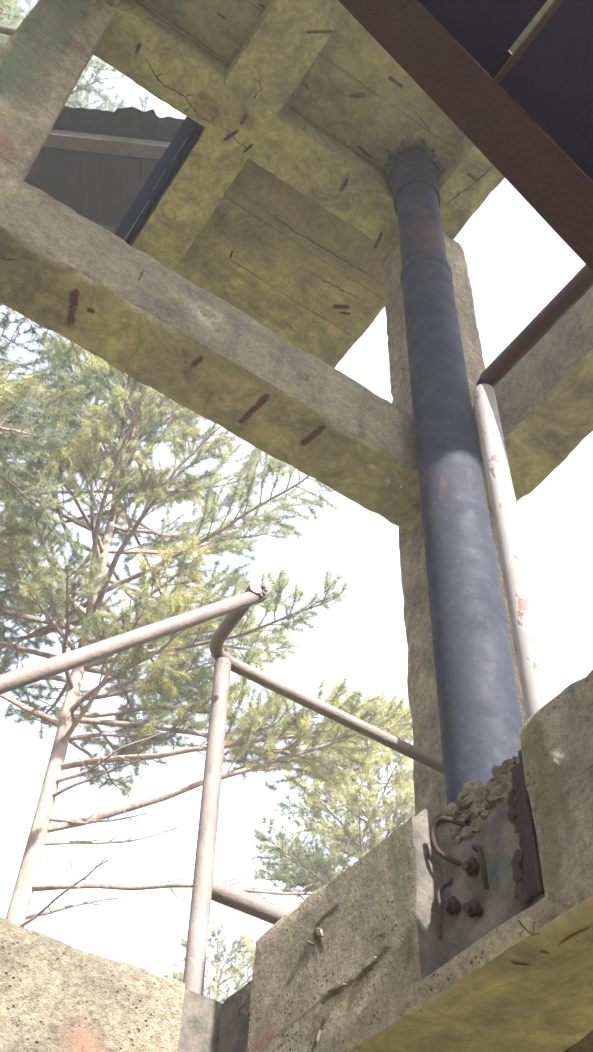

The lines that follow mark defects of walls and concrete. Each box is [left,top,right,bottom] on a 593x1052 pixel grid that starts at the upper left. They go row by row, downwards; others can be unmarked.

crack [146,60,247,149]
corrosion [67,290,94,325]
corrosion [239,394,270,423]
spalling [430,752,545,939]